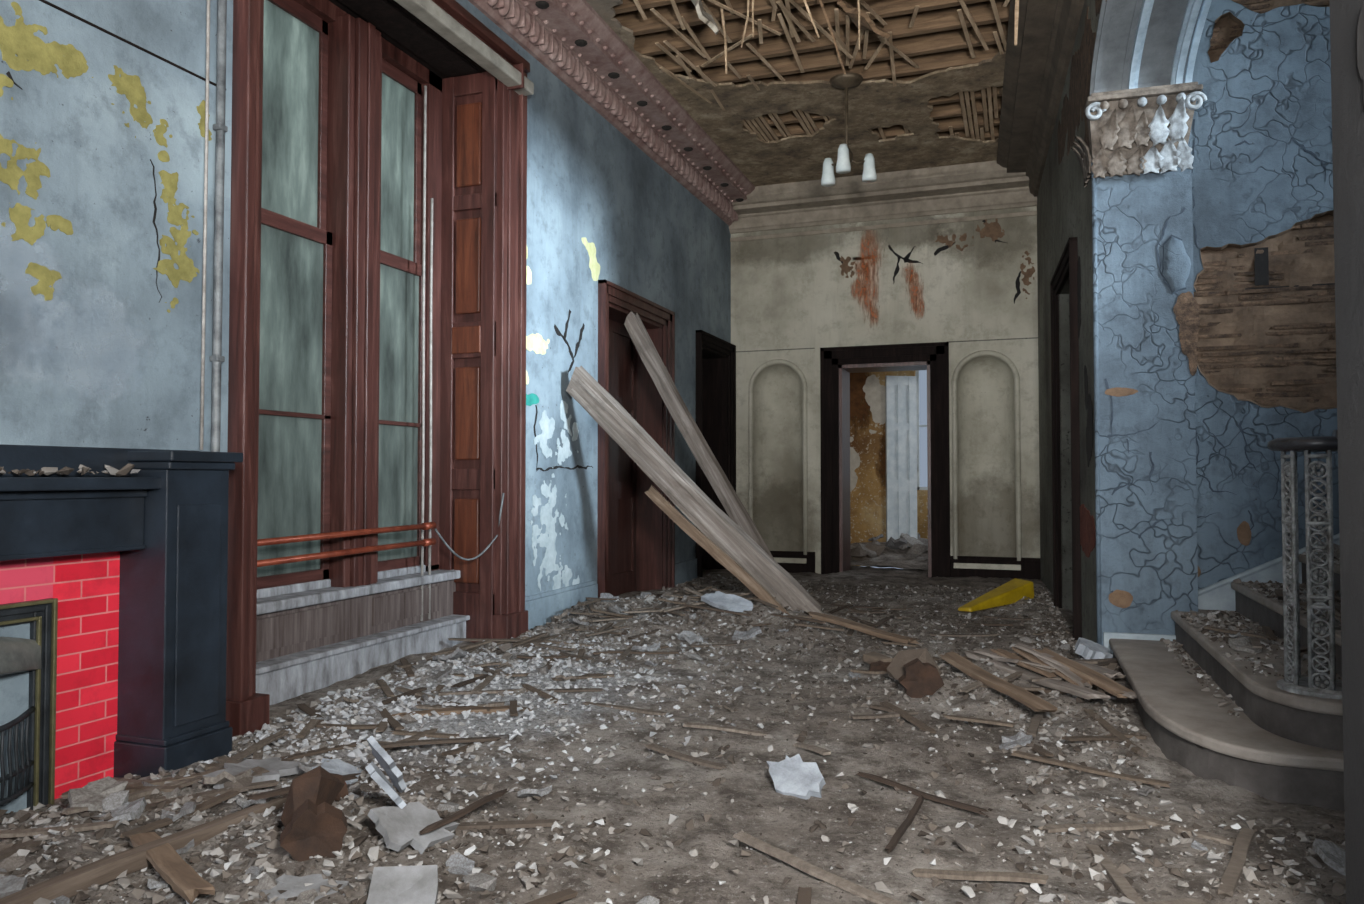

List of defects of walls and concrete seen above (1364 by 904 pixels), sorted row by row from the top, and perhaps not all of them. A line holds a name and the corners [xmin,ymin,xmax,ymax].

spalling [633,0,919,111]
spalling [957,0,1010,58]
flaking render [1208,0,1330,63]
peeling [0,2,200,313]
spalling [949,87,998,141]
crack [1291,126,1333,181]
crack [1156,119,1198,295]
corrosion [852,235,878,323]
corrosion [905,267,924,316]
flaking render [1173,210,1337,413]
peeling [863,374,886,434]
crack [1104,379,1280,539]